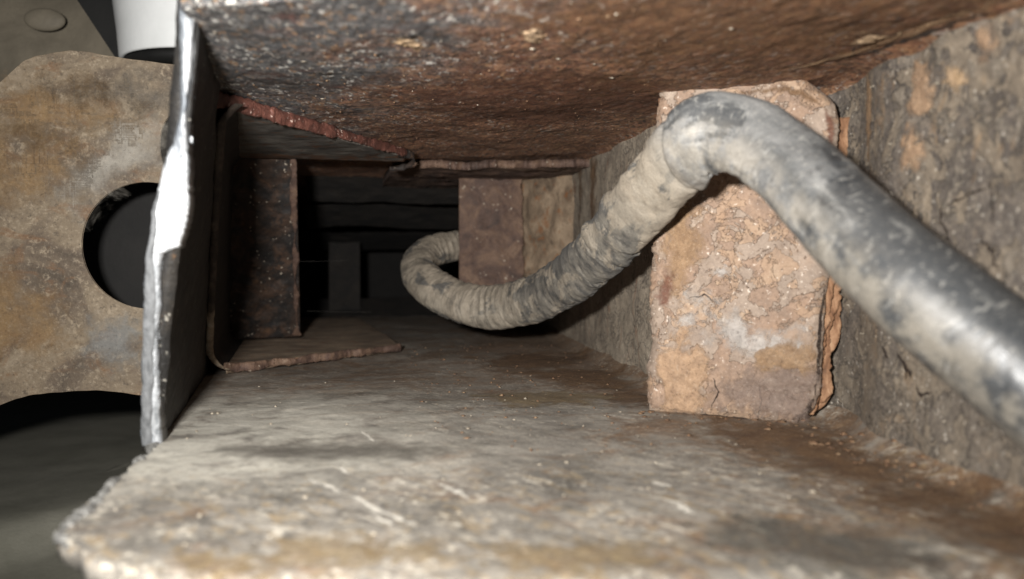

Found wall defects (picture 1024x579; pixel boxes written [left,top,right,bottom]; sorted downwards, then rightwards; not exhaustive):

rust [752,87,817,102]
rust [826,114,850,157]